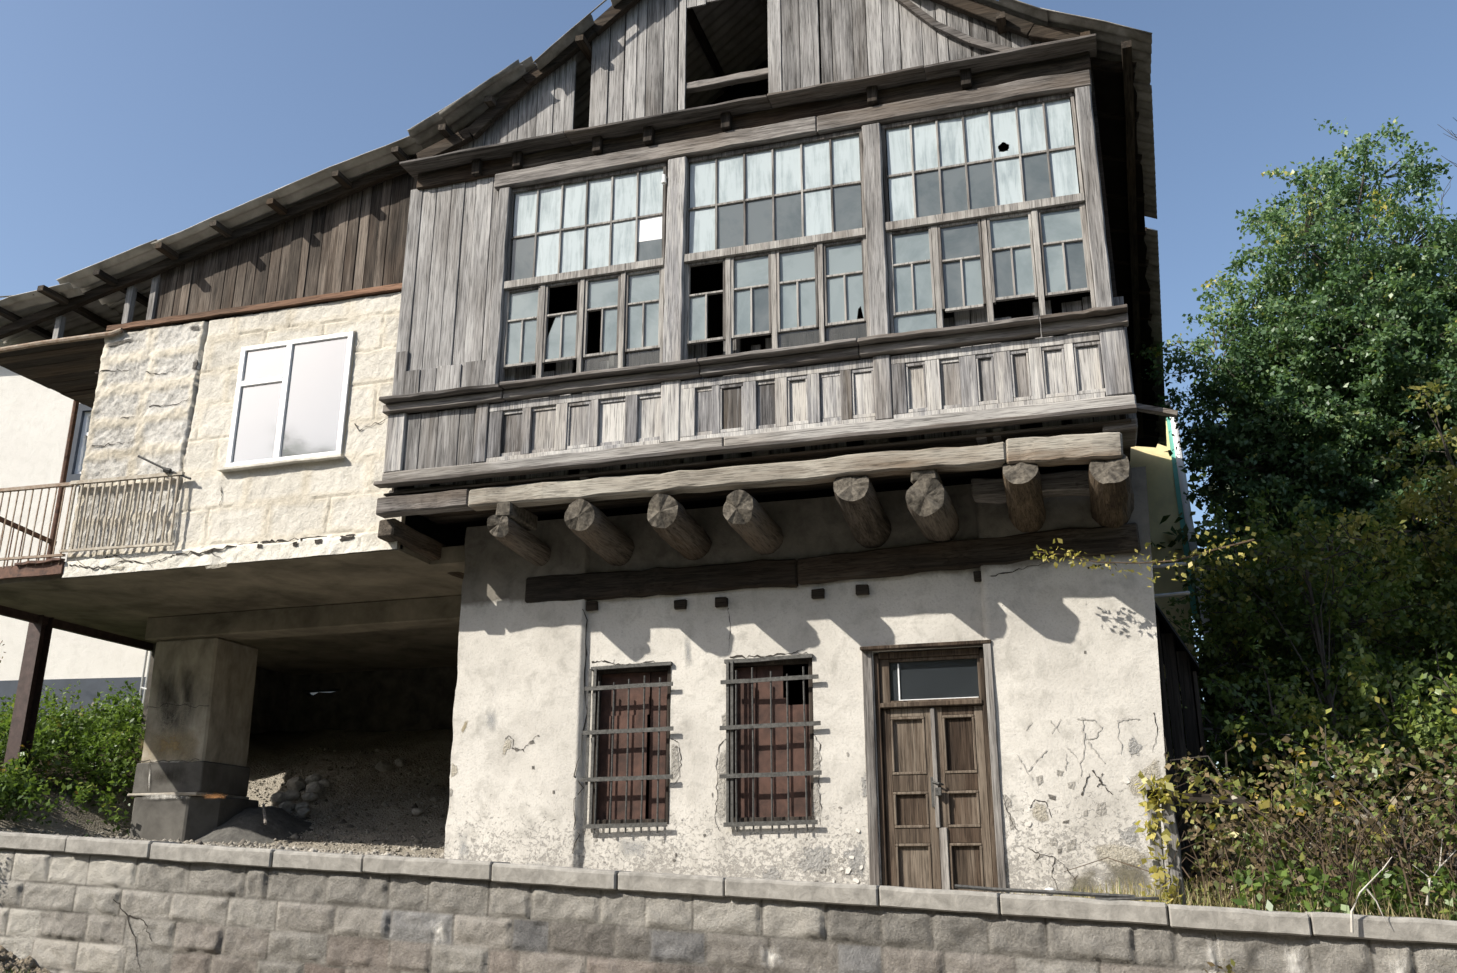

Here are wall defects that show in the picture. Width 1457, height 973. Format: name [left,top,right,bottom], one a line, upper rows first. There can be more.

flaking render [1123,736,1160,796]
crack [1152,713,1167,784]
flaking render [1003,770,1144,867]